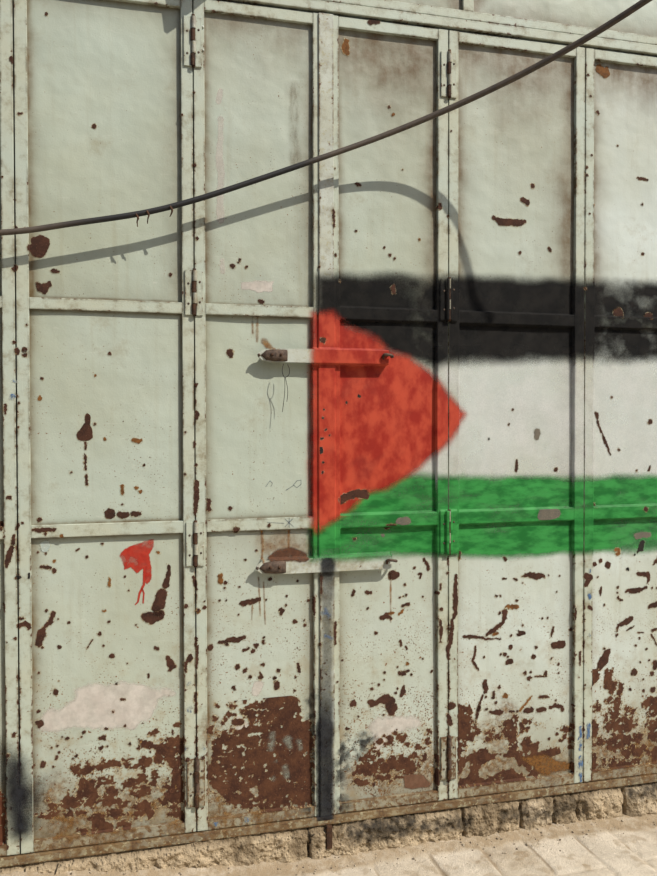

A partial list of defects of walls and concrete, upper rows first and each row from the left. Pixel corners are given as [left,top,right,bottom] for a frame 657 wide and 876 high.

peeling [154,635,266,673]
peeling [33,663,315,835]
corrosion [387,762,435,789]
corrosion [522,755,571,775]